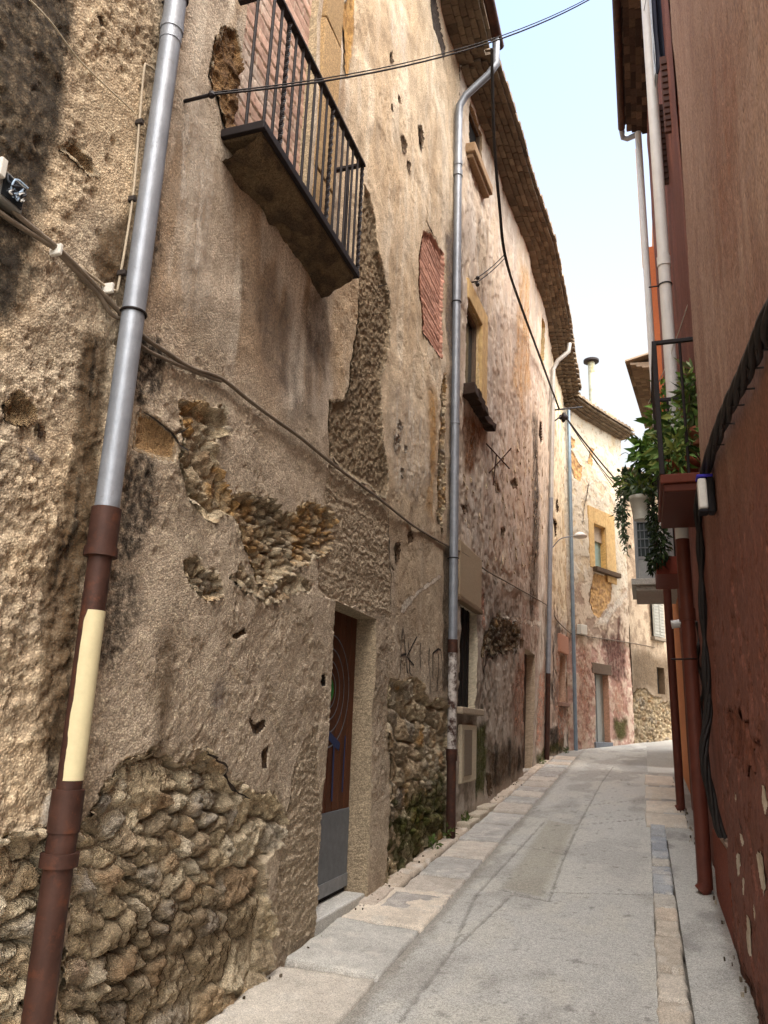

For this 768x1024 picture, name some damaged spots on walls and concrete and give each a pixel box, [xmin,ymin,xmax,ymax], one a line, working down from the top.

flaking render [209,25,245,128]
flaking render [328,184,408,499]
flaking render [418,232,445,359]
flaking render [133,400,339,605]
flaking render [481,613,524,658]
flaking render [589,573,612,618]
crack [206,751,250,799]